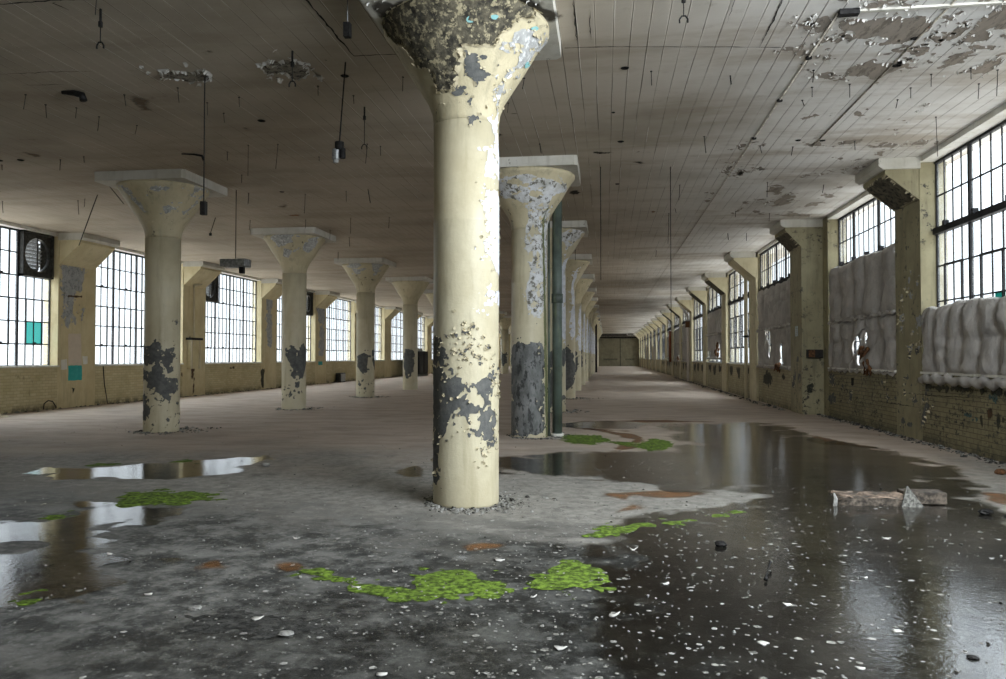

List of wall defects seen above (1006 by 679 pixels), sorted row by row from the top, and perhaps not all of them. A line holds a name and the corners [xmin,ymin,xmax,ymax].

spalling [255,49,324,83]
crack [306,0,396,56]
peeling [773,0,1006,84]
spalling [367,0,568,491]
peeling [265,299,273,348]
peeling [316,308,326,356]
peeling [562,229,595,391]
peeling [141,319,181,432]
peeling [282,343,307,401]
peeling [357,349,375,393]